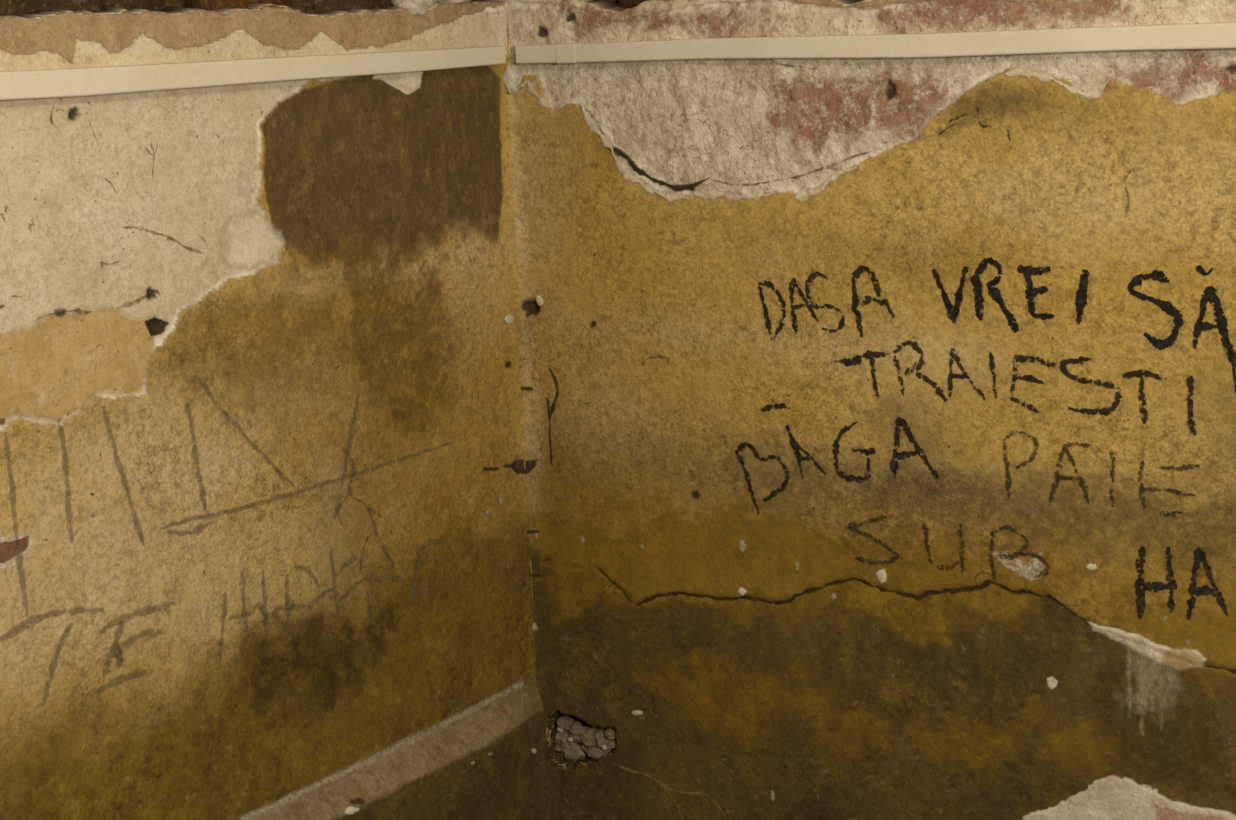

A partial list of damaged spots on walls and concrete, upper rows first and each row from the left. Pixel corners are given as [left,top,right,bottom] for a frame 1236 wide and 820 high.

peeling [0,0,1236,202]
peeling [0,76,356,431]
leakage [262,66,502,424]
spalling [504,295,544,324]
peeling [0,532,34,569]
peeling [992,552,1045,580]
leakage [0,512,1236,820]
crack [596,570,1086,676]
peeling [1088,621,1206,669]
crack [1204,665,1236,673]
spalling [530,711,617,766]
peeling [1022,775,1236,820]